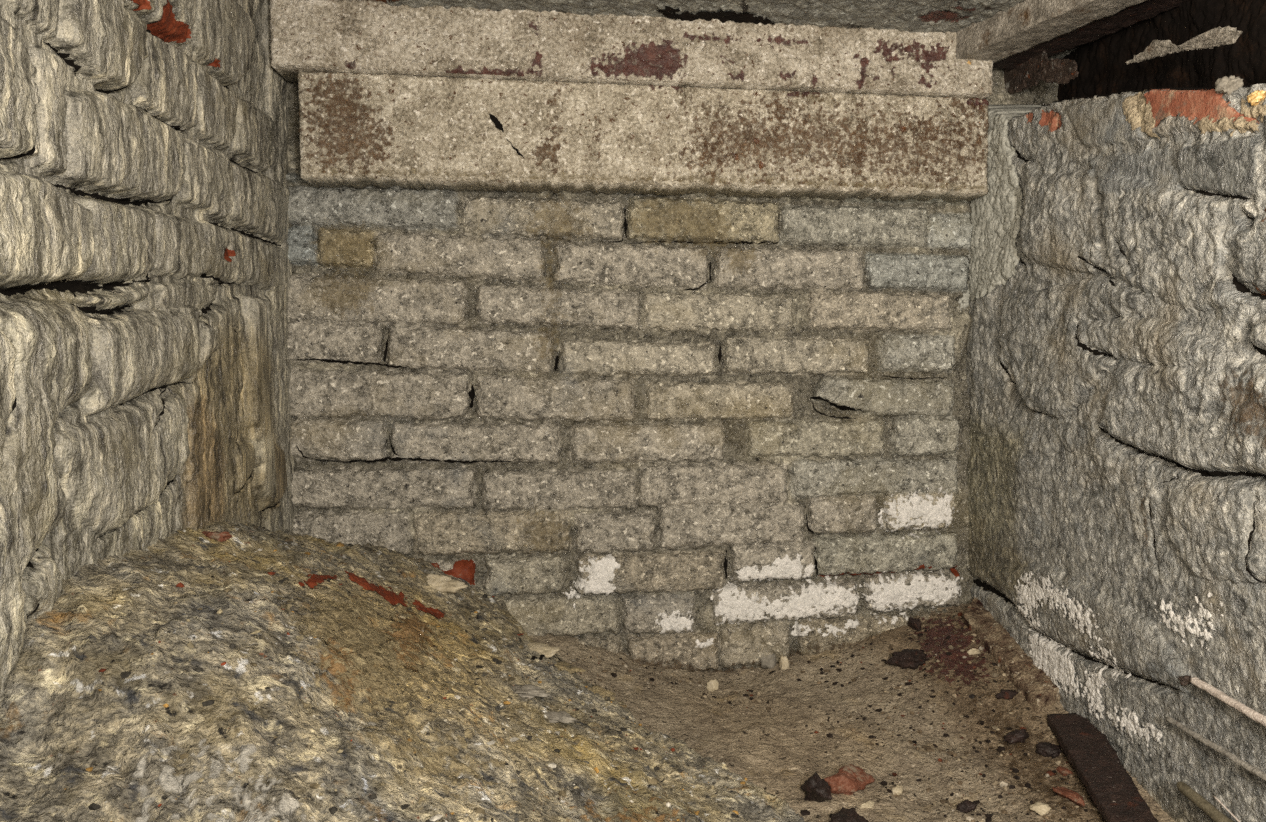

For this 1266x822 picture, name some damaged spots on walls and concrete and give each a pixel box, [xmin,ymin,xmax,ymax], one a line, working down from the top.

spalling [130,0,191,43]
rust [531,82,564,174]
rust [588,31,989,188]
crack [883,373,947,381]
crack [810,396,863,419]
damp [878,486,958,539]
damp [563,553,621,609]
damp [655,554,963,660]
damp [630,658,762,673]